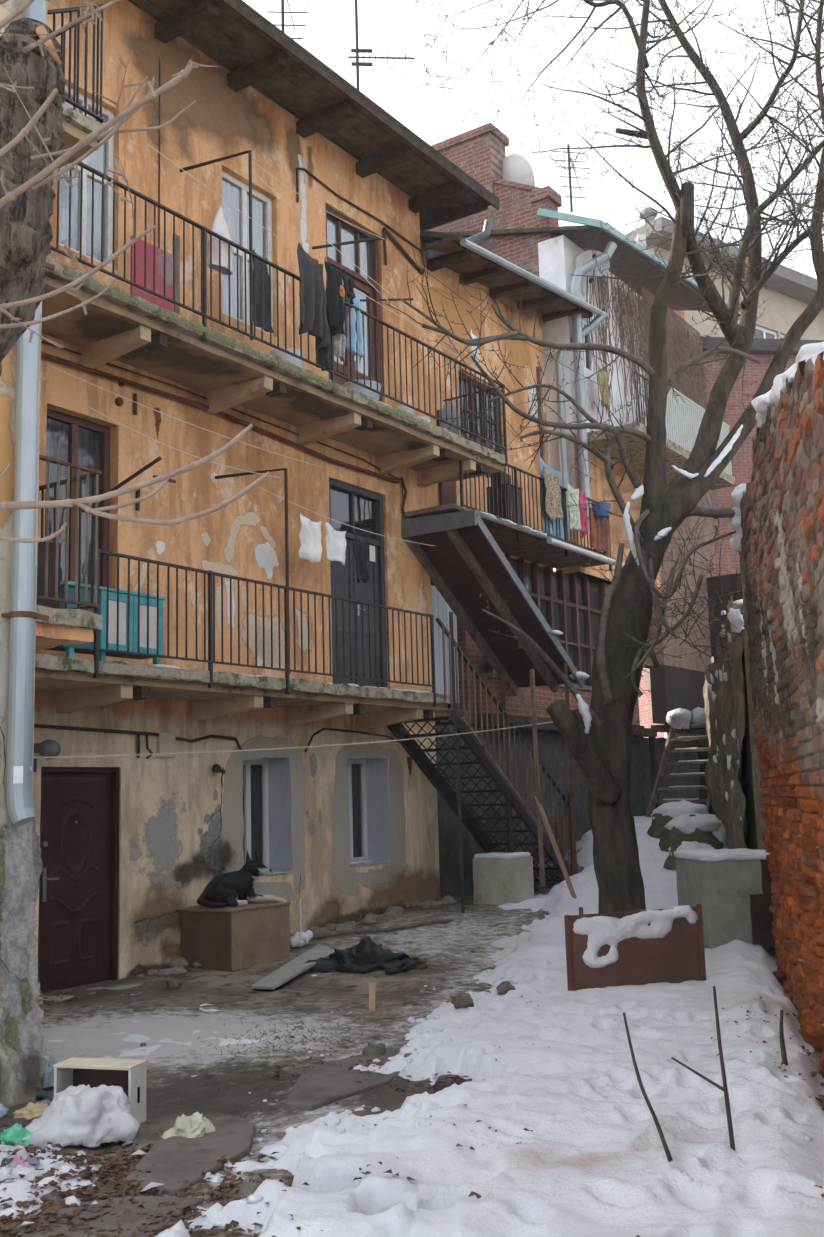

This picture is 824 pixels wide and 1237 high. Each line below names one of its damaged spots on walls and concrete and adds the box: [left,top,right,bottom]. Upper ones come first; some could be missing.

peeling [200,512,312,684]
spalling [103,663,203,681]
crack [0,718,8,797]
peeling [130,798,187,888]
peeling [198,789,223,870]